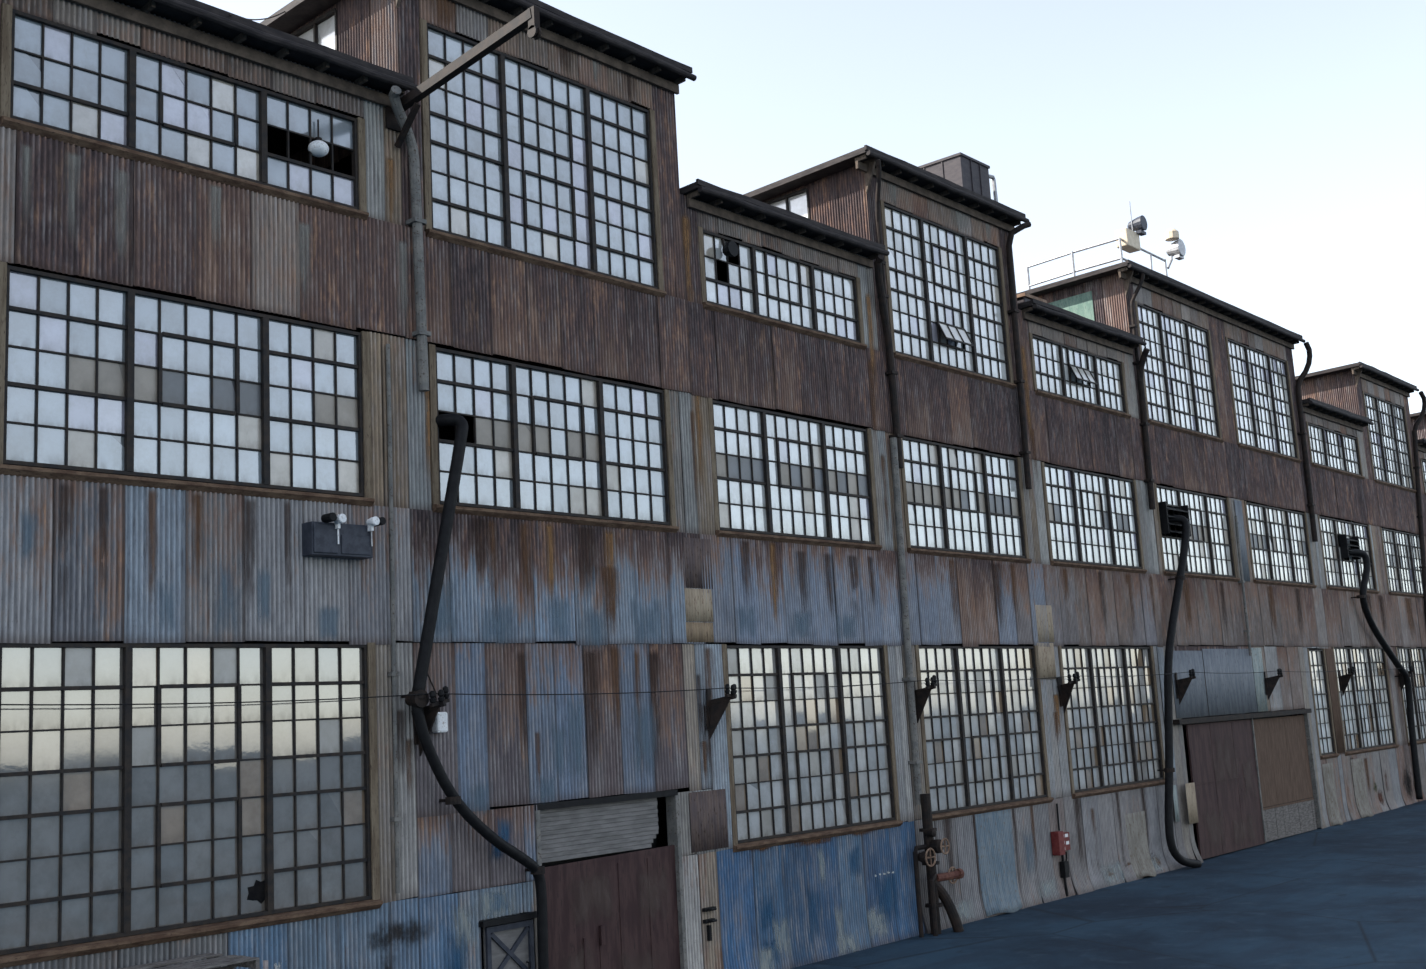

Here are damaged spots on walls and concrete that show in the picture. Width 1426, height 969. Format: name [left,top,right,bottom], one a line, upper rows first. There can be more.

rust [992,564,1017,615]
rust [519,655,540,775]
rust [586,649,659,740]